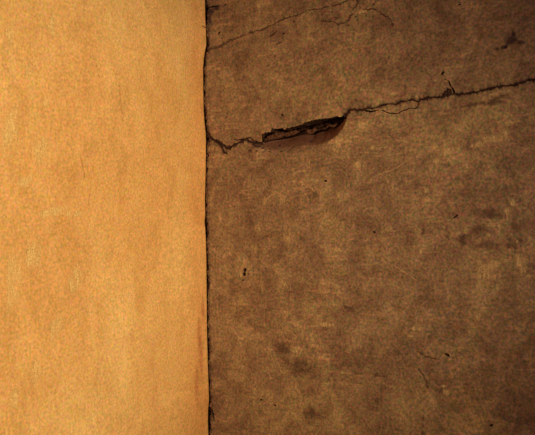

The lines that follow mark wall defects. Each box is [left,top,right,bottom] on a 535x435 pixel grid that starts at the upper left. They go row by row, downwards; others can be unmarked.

crack [343,78,535,118]
spalling [249,116,347,152]
crack [202,0,394,435]